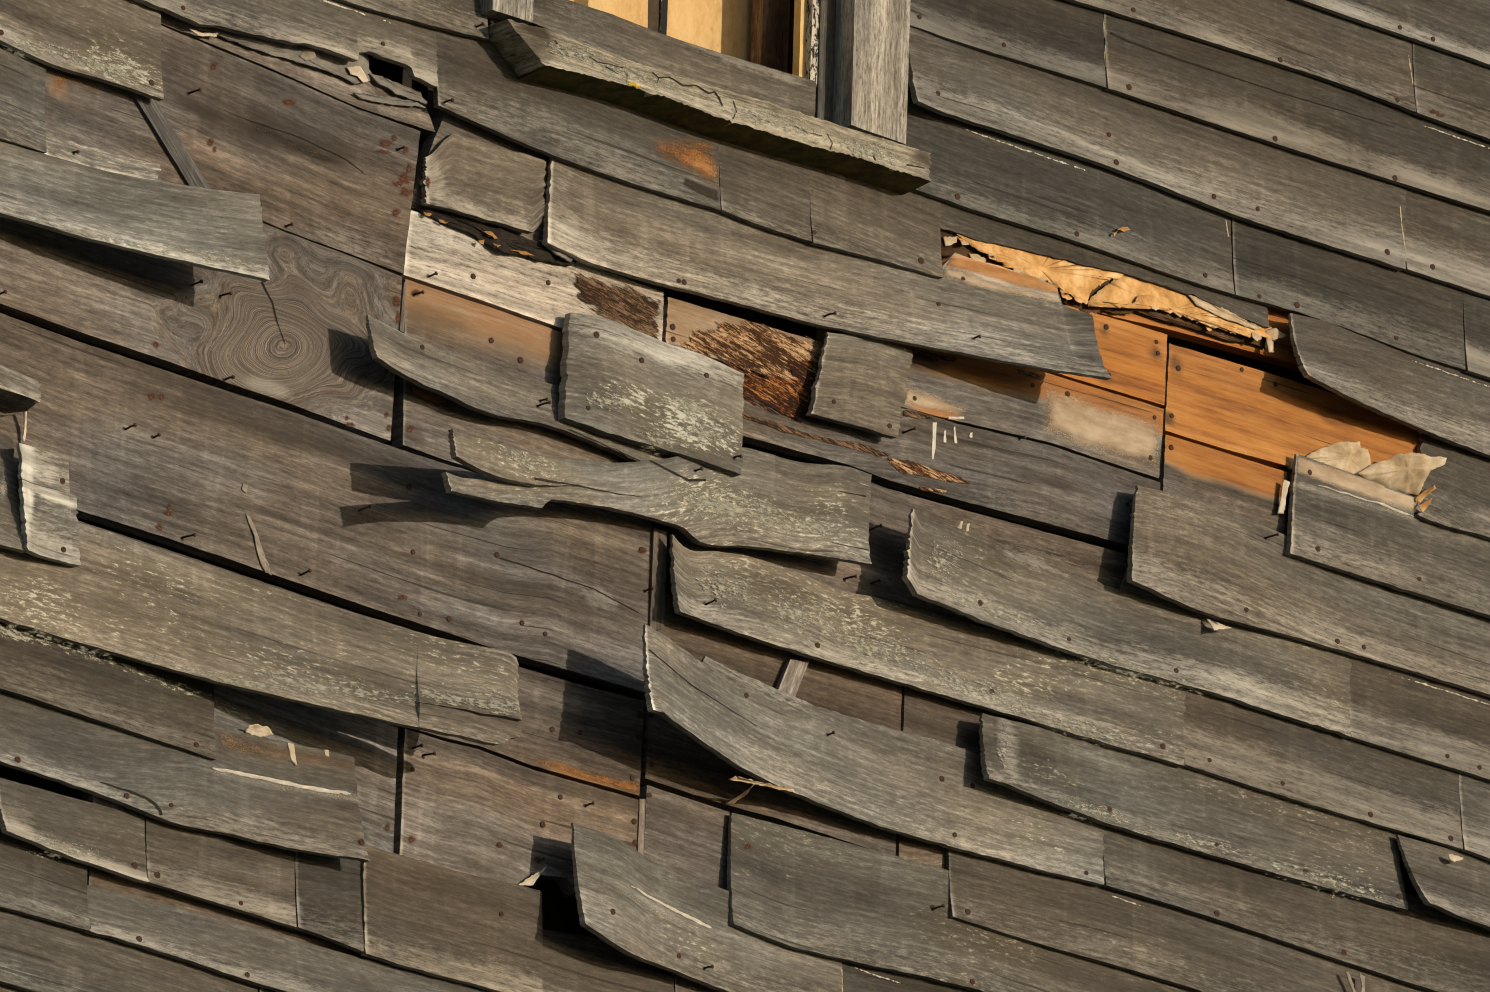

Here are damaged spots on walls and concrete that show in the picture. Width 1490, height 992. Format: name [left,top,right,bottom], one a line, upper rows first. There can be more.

peeling [942,258,1060,301]